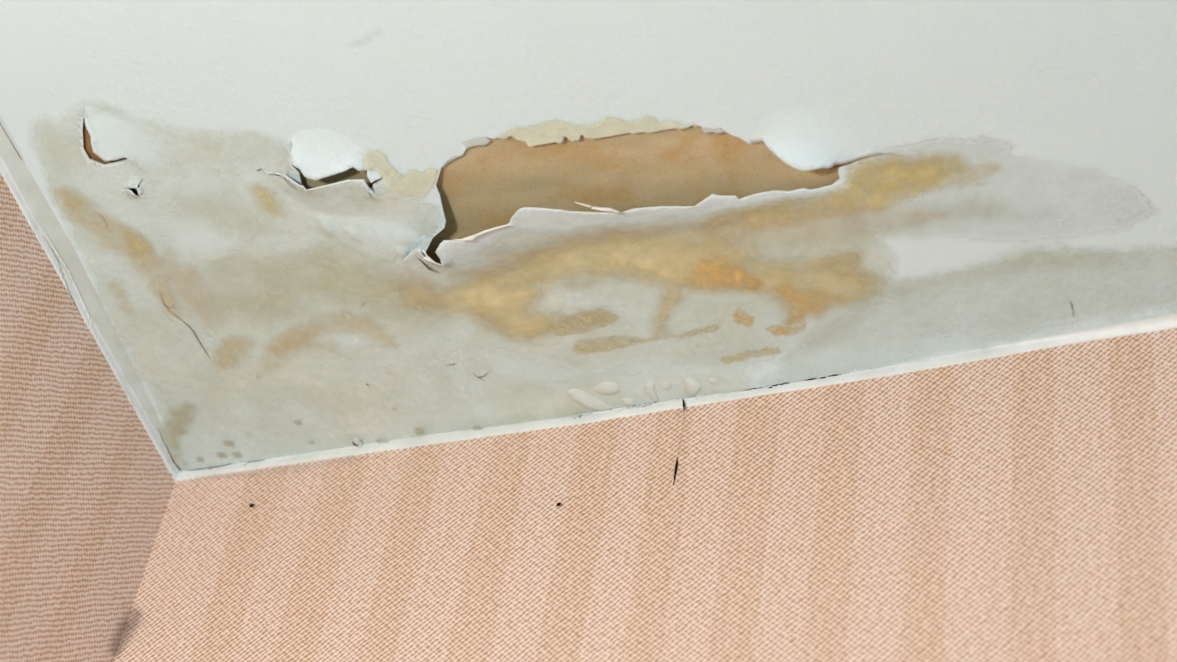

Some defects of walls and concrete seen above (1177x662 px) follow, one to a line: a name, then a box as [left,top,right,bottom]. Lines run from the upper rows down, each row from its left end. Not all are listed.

peeling [83,106,148,175]
peeling [257,129,382,216]
water stain [498,116,696,147]
peeling [400,107,913,290]
water stain [113,151,946,451]